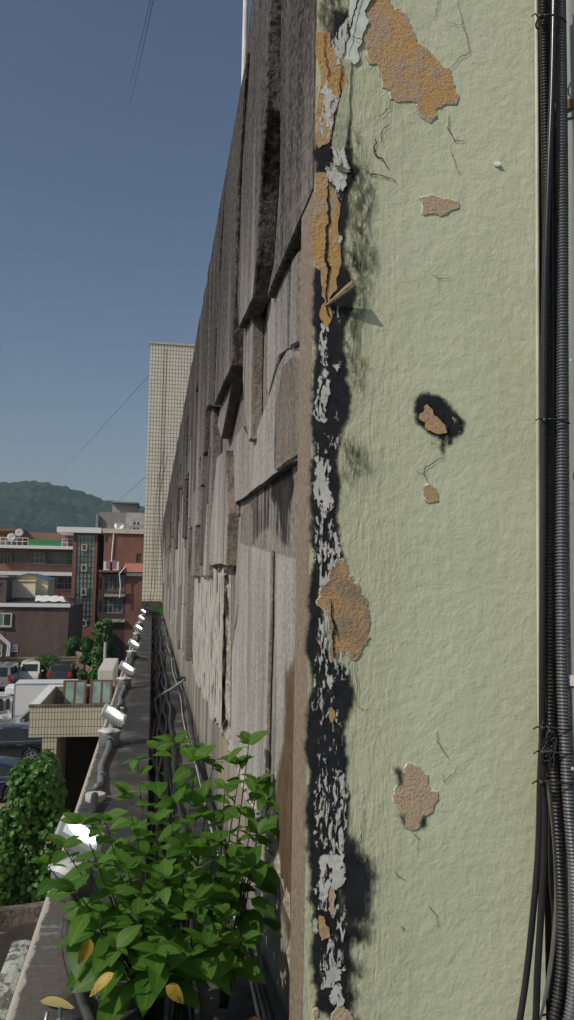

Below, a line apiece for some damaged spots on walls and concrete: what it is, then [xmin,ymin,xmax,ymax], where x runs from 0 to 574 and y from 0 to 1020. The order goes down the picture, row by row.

crack [435,1,470,68]
crack [367,99,397,182]
water stain [414,392,465,452]
water stain [251,468,293,544]
flaking render [309,0,460,1020]
water stain [304,132,376,1020]
spalling [234,764,271,817]
spalling [263,833,290,920]